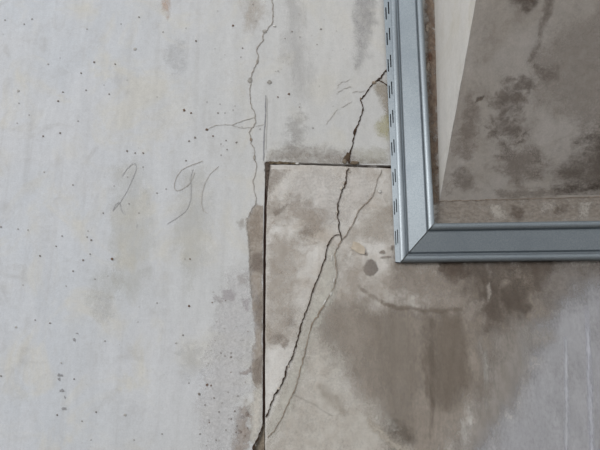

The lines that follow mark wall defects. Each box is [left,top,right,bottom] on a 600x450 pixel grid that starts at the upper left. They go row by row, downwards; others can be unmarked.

crack [210,2,274,293]
damp [249,385,262,442]
crack [265,69,387,437]
damp [266,239,600,450]
damp [424,0,600,223]